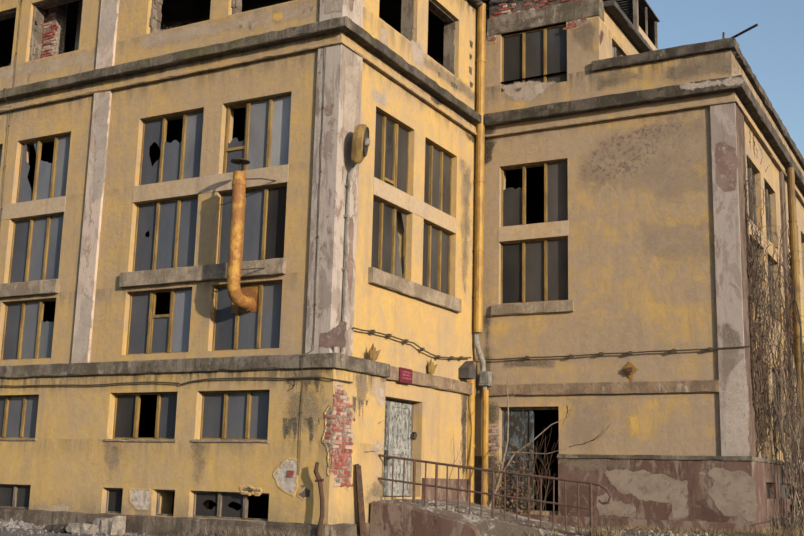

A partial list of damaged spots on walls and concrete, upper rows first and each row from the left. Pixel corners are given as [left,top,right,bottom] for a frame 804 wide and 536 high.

peeling [136,0,354,51]
peeling [501,81,555,102]
peeling [680,77,744,90]
peeling [714,142,738,192]
peeling [307,61,360,348]
water stain [282,368,327,449]
water stain [353,374,369,419]
peeling [723,355,750,455]
spalling [322,381,355,492]
spalling [239,485,263,496]
spalling [273,457,314,502]
peeling [559,458,758,522]